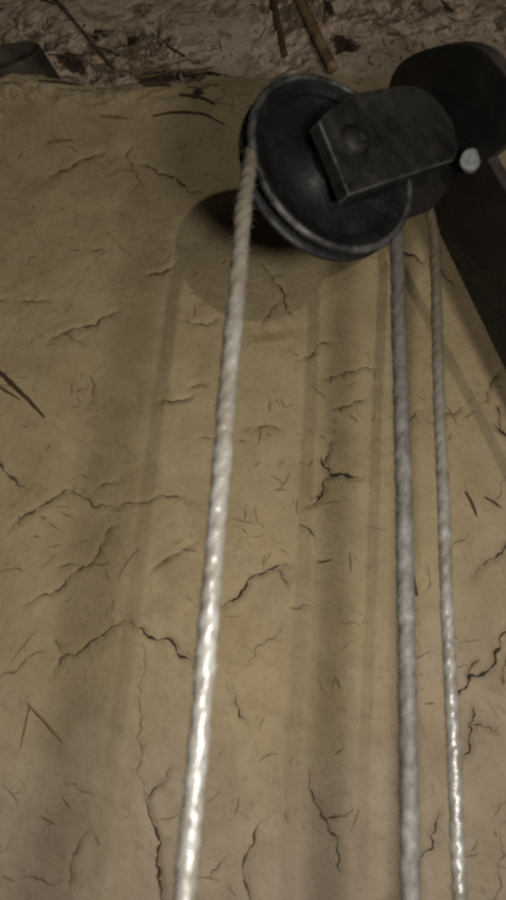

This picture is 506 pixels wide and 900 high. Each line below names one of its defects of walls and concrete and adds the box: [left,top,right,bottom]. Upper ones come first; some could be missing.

crack [49,312,115,344]
crack [0,463,189,605]
crack [298,442,356,537]
crack [220,564,290,607]
crack [248,604,312,663]
crack [458,631,506,756]
crack [0,620,193,900]
crack [308,767,354,876]
crack [493,803,505,900]